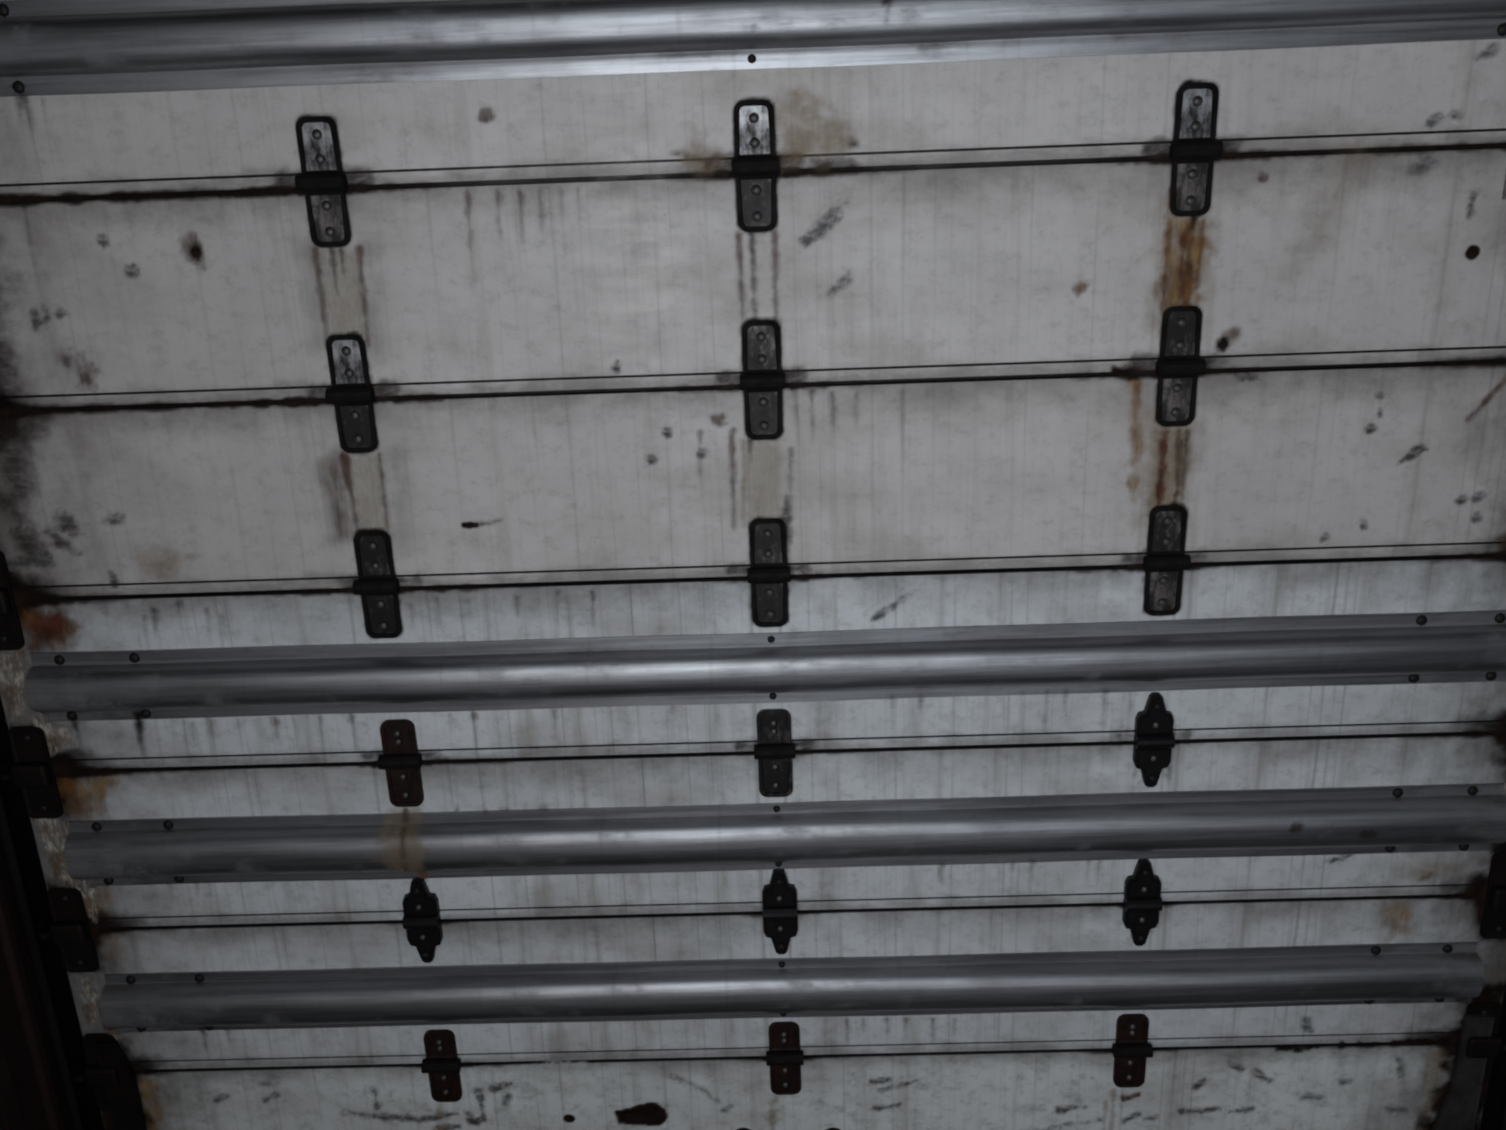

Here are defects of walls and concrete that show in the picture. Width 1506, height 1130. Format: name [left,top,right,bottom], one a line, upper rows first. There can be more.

corrosion [1160,216,1207,306]
corrosion [1156,430,1188,506]
corrosion [23,608,76,649]